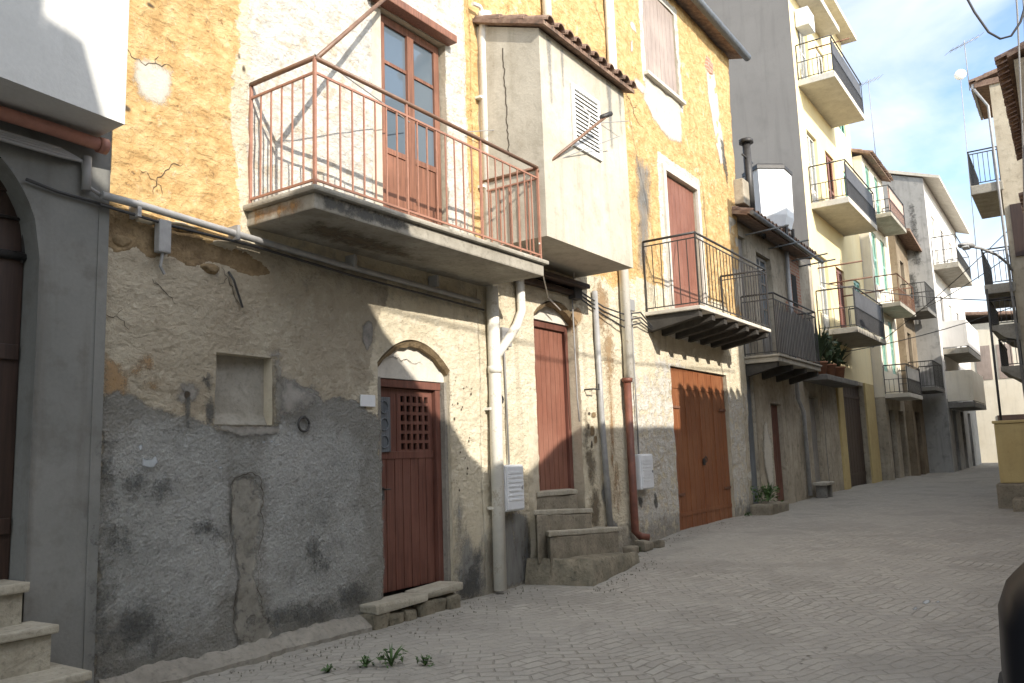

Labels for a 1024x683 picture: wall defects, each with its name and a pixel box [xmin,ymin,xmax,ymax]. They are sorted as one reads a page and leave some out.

peeling [134,59,171,105]
crack [502,48,510,157]
peeling [635,79,682,142]
crack [140,163,183,194]
spalling [108,210,270,276]
peeling [103,355,152,395]
spalling [229,472,273,645]